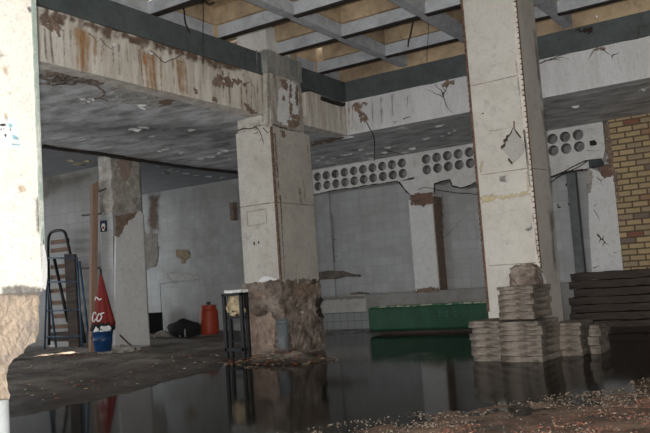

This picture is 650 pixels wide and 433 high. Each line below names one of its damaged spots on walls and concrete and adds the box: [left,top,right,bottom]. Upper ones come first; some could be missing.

corrosion [76,29,102,71]
spalling [39,8,246,89]
crack [86,87,123,103]
spalling [277,79,301,138]
crack [236,124,305,143]
flaking render [501,121,526,164]
spalling [98,192,137,237]
spalling [409,192,434,208]
crack [433,179,476,194]
spalling [145,232,160,270]
spalling [176,249,190,264]
spalling [241,276,326,357]